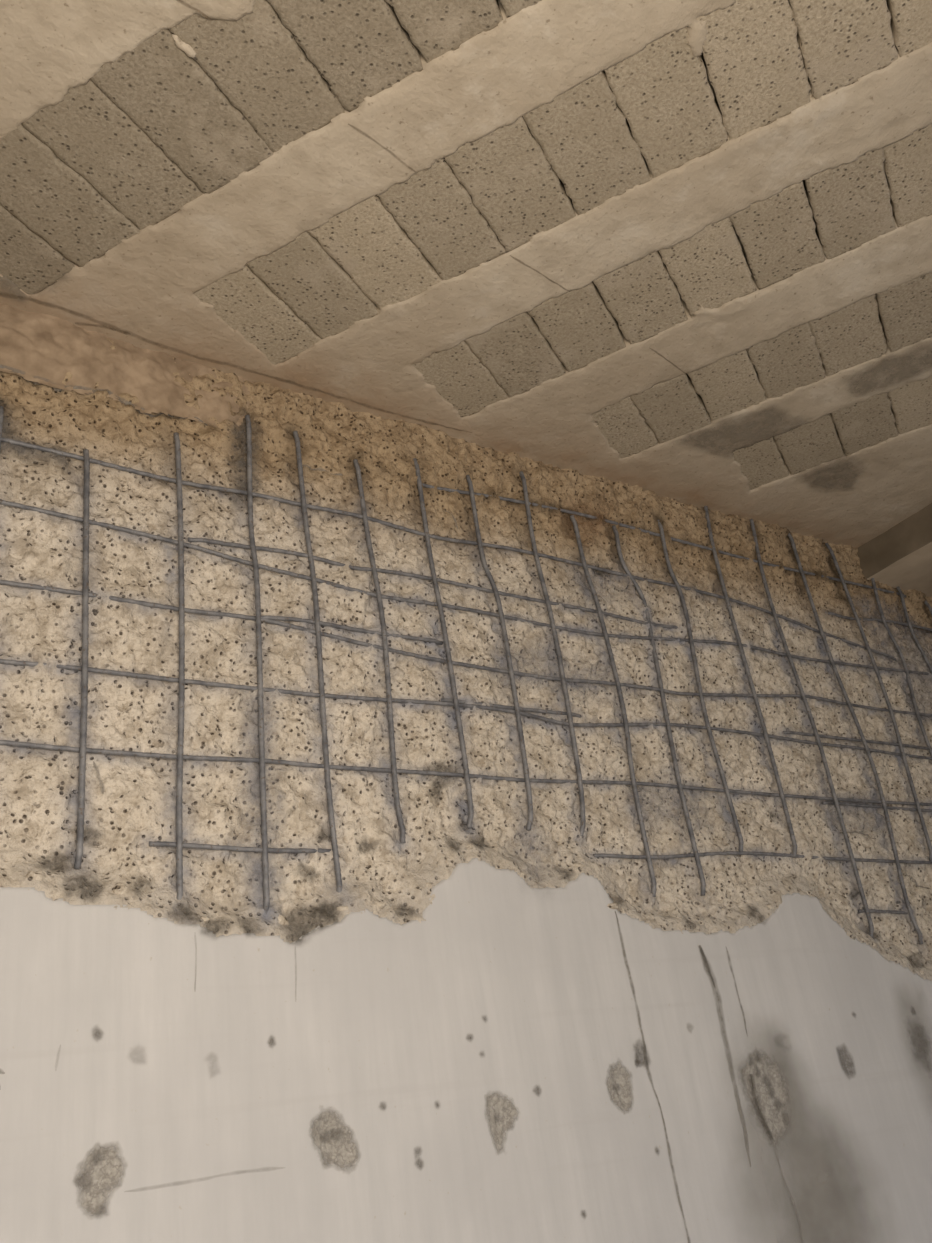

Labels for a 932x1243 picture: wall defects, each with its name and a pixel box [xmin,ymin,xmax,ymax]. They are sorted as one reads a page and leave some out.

damp [689,410,789,453]
spalling [0,357,932,981]
spalling [312,1110,358,1169]
spalling [487,1093,518,1151]
spalling [607,1062,639,1111]
crack [615,912,690,1243]
crack [699,945,804,1243]
spalling [77,1146,123,1215]